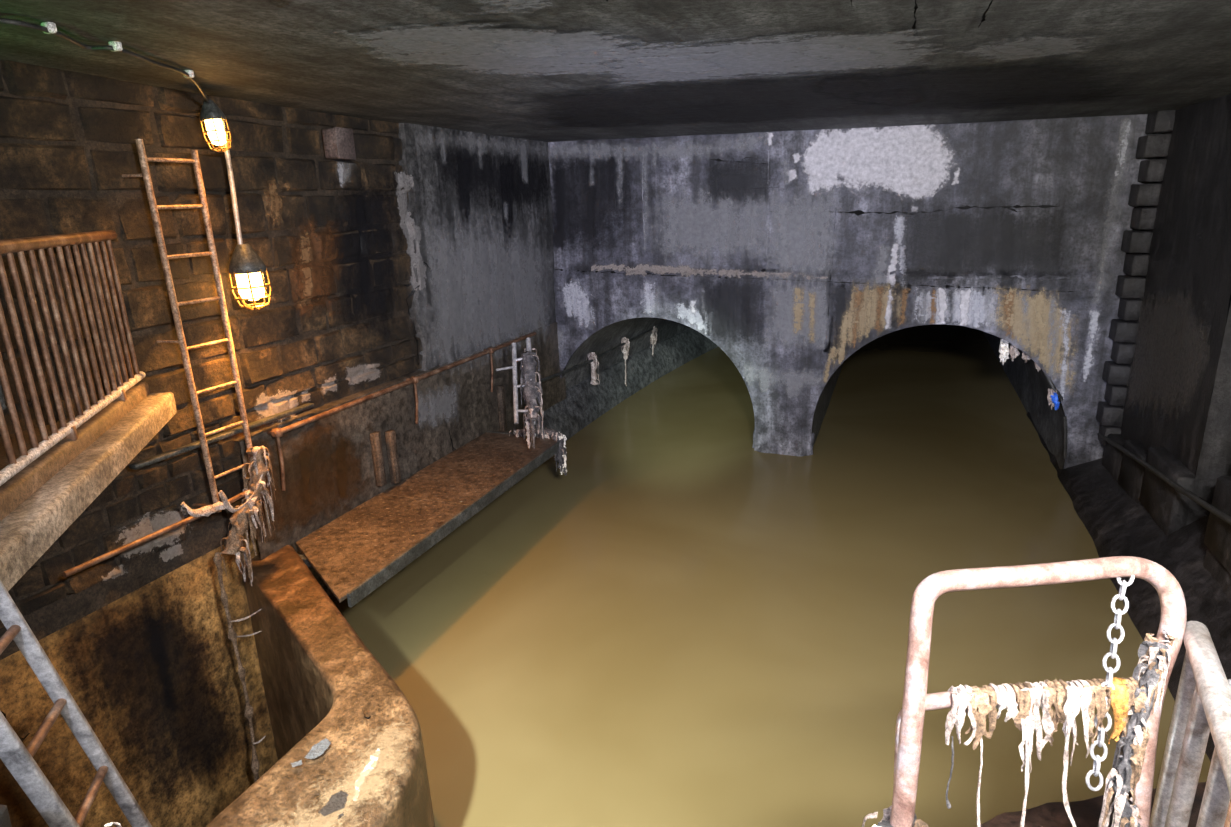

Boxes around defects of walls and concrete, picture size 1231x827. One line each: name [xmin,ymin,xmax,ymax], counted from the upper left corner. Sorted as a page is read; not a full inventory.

crack [911,0,919,36]
crack [978,0,993,28]
leakage [1113,119,1131,202]
leakage [421,132,853,369]
rust [824,283,910,383]
leakage [874,207,1067,328]
rust [996,287,1075,399]
leakage [1083,262,1105,381]